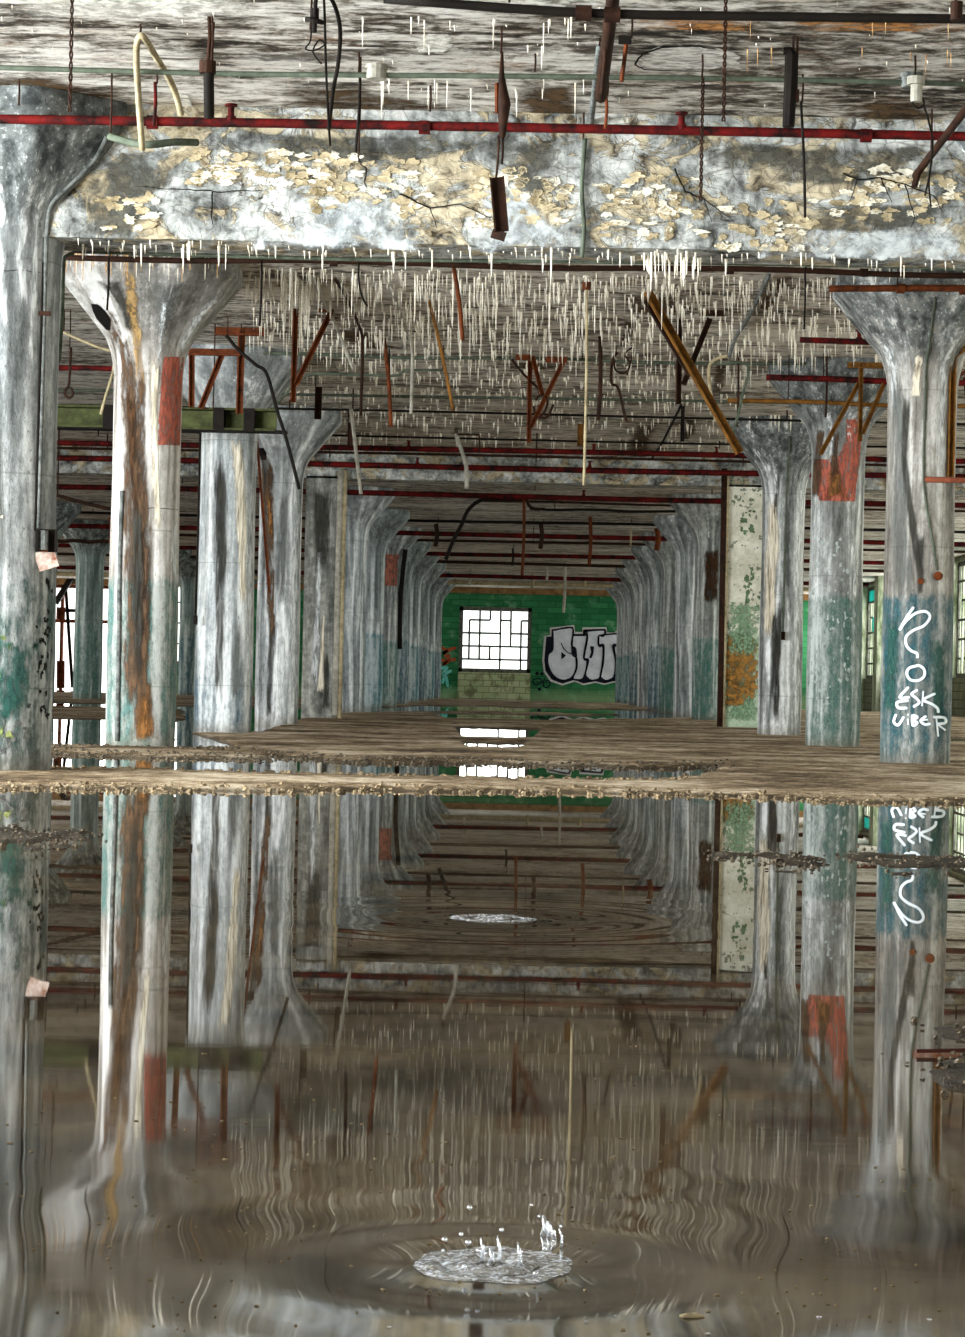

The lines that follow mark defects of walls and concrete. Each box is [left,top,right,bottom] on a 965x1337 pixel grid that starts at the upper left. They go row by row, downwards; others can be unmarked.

peeling [94,191,164,231]
peeling [185,147,434,220]
peeling [466,164,575,229]
peeling [591,163,964,253]
rust [812,431,842,496]
rust [108,275,154,739]